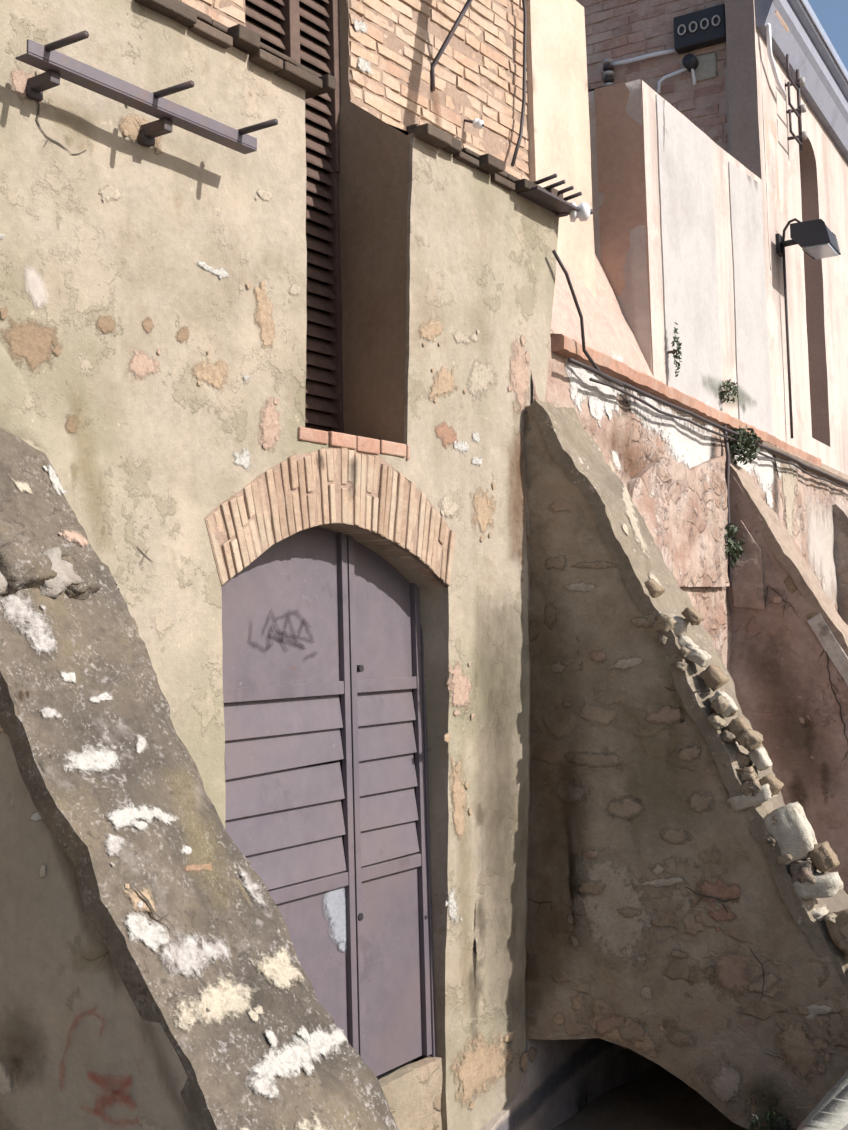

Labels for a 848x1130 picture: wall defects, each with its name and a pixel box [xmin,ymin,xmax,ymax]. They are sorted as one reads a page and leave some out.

flaking render [119,114,149,141]
spalling [0,307,62,370]
spalling [193,350,228,389]
spalling [246,281,275,347]
spalling [429,334,531,413]
spalling [439,482,496,542]
crack [818,649,848,760]
flaking render [450,1031,537,1109]